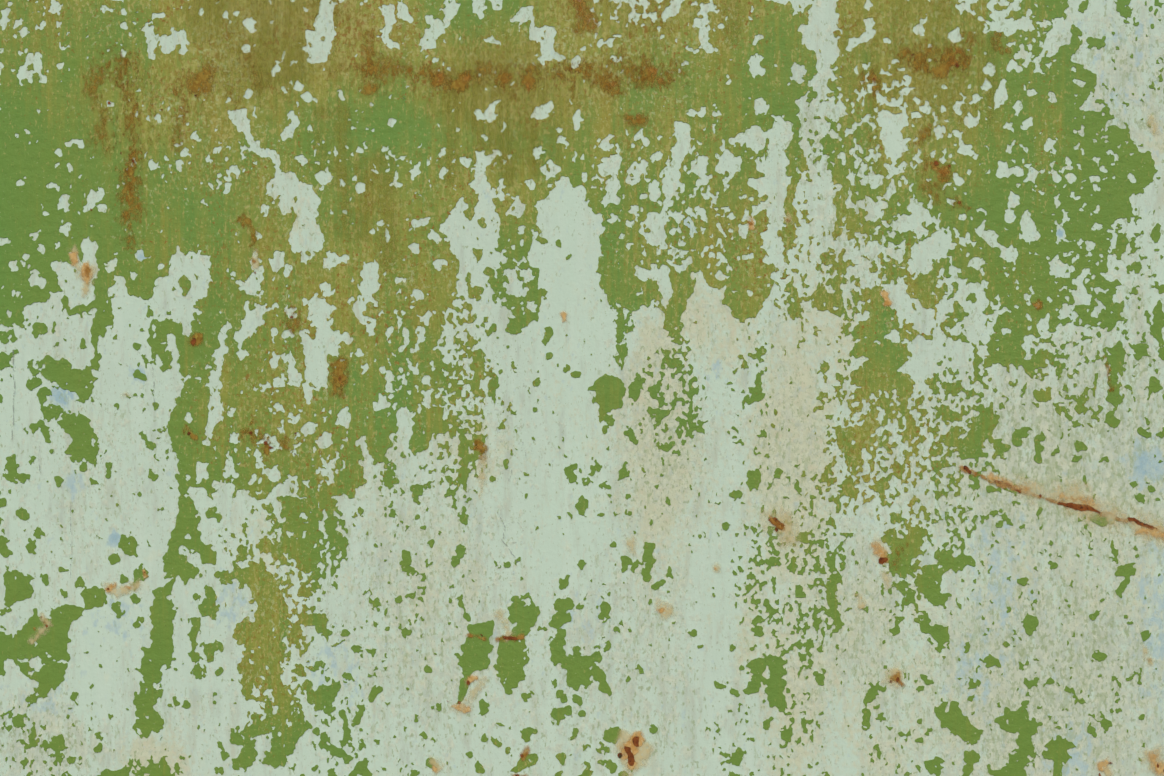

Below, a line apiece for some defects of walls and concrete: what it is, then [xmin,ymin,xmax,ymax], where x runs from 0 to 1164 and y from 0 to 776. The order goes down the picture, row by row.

corrosion [361,31,538,95]
corrosion [554,56,685,96]
corrosion [960,465,1164,537]
corrosion [617,731,651,770]
corrosion [1146,753,1164,774]